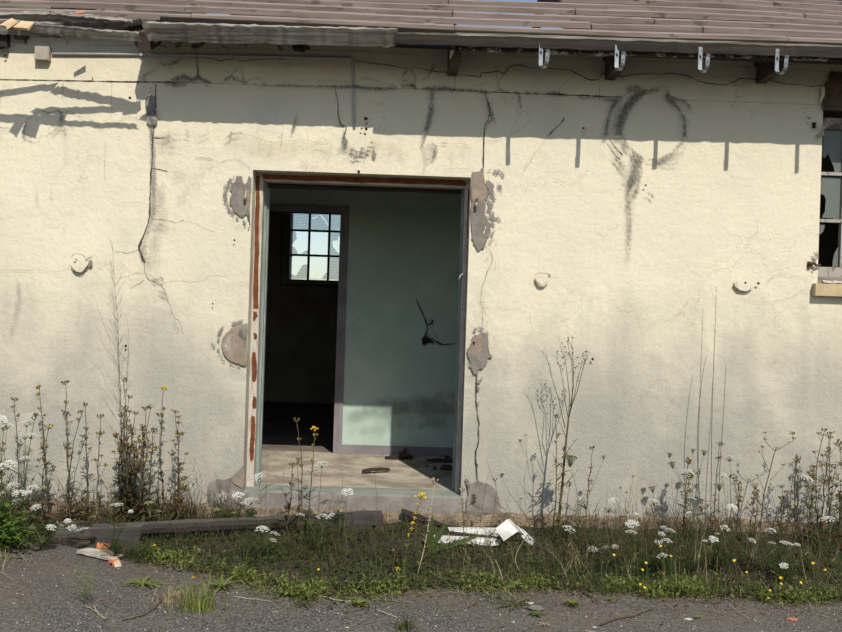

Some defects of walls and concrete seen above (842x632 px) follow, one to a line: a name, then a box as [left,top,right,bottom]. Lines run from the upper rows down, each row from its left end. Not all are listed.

crack [0,45,293,105]
crack [313,50,822,170]
leakage [604,86,690,210]
crack [115,125,183,333]
spalling [211,168,505,391]
crack [416,300,456,345]
crack [470,375,480,479]
spalling [459,478,502,516]